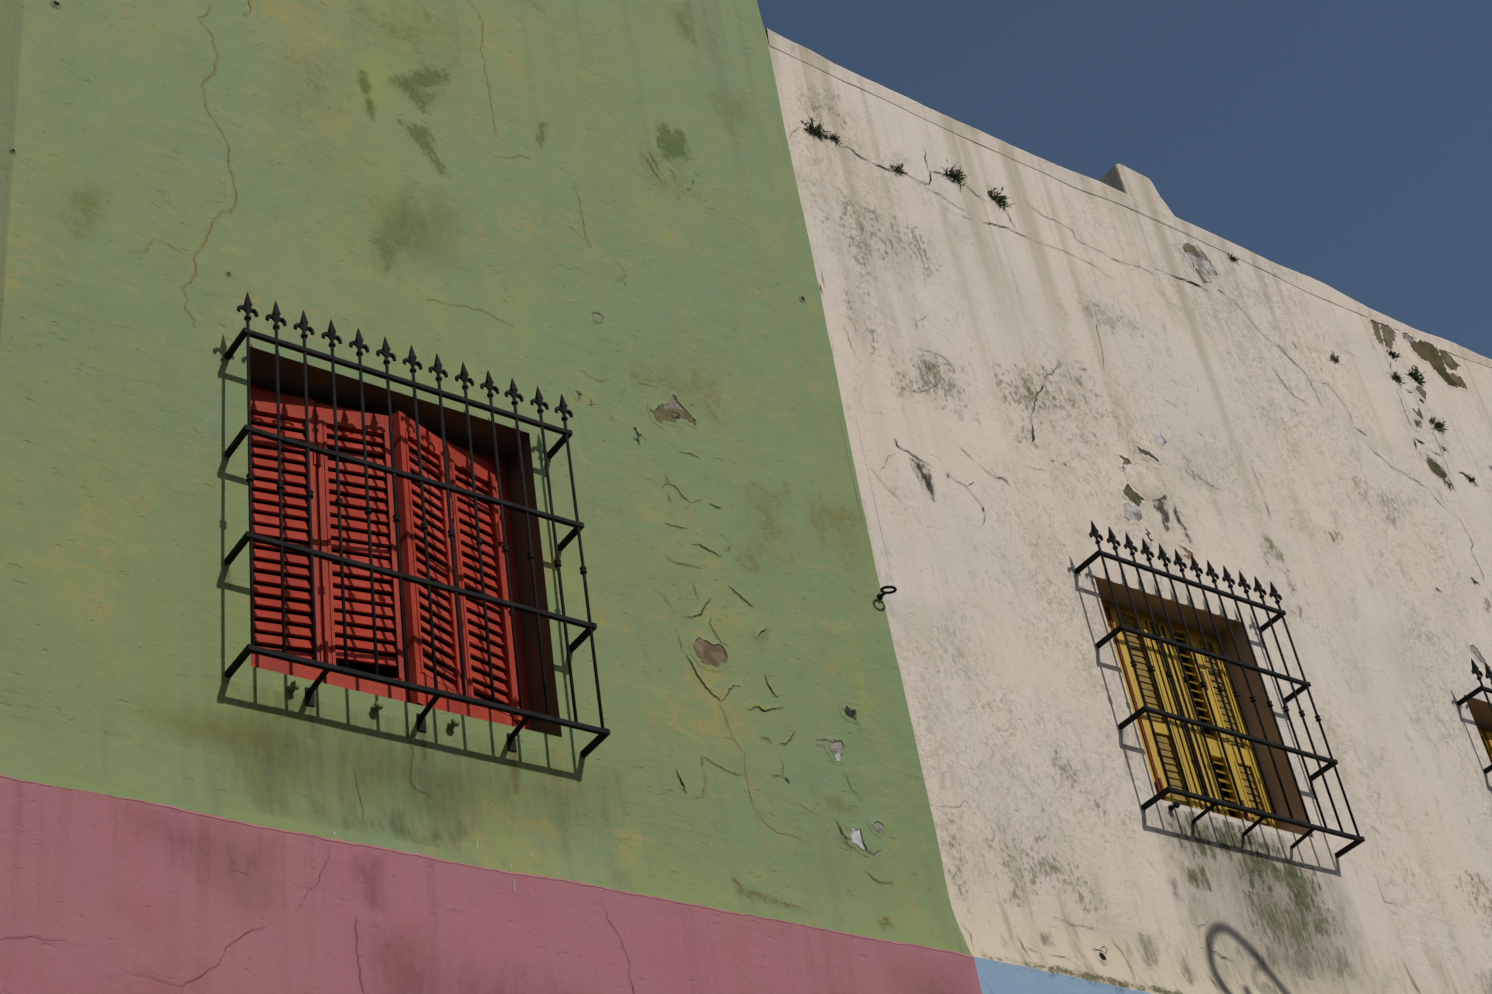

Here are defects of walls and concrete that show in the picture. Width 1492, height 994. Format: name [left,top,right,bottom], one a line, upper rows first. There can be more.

crack [141,3,248,319]
spalling [1179,240,1220,284]
crack [841,146,1492,593]
spalling [1367,317,1470,392]
peeling [647,390,700,458]
spalling [1409,383,1429,427]
spalling [1115,430,1168,526]
peeling [688,620,732,672]
peeling [816,701,860,766]
peeling [834,816,888,857]